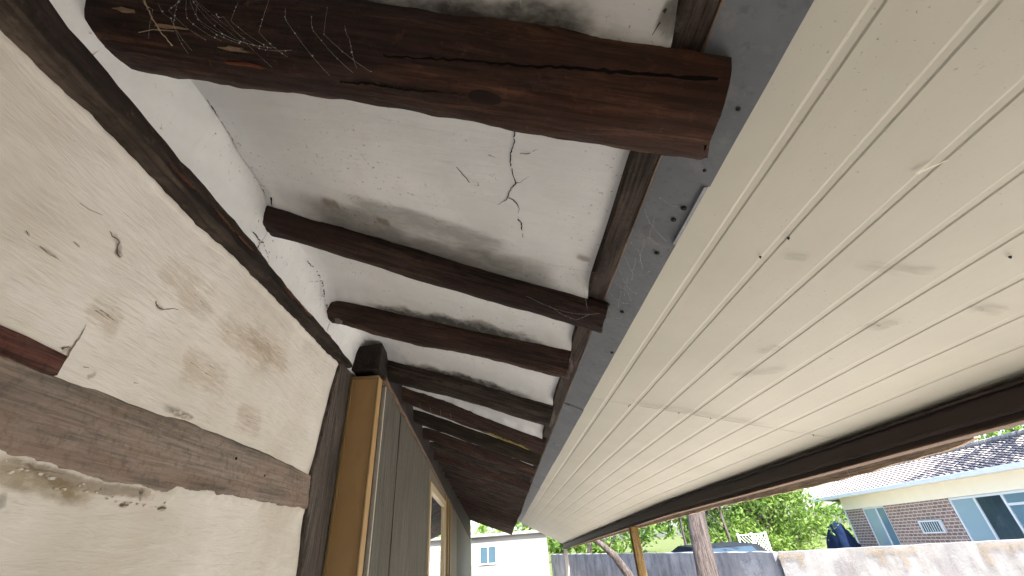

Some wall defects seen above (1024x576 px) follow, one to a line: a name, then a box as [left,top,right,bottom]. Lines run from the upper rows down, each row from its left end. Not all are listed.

crack [489,132,535,237]
damp [326,209,526,282]
spalling [6,465,167,510]